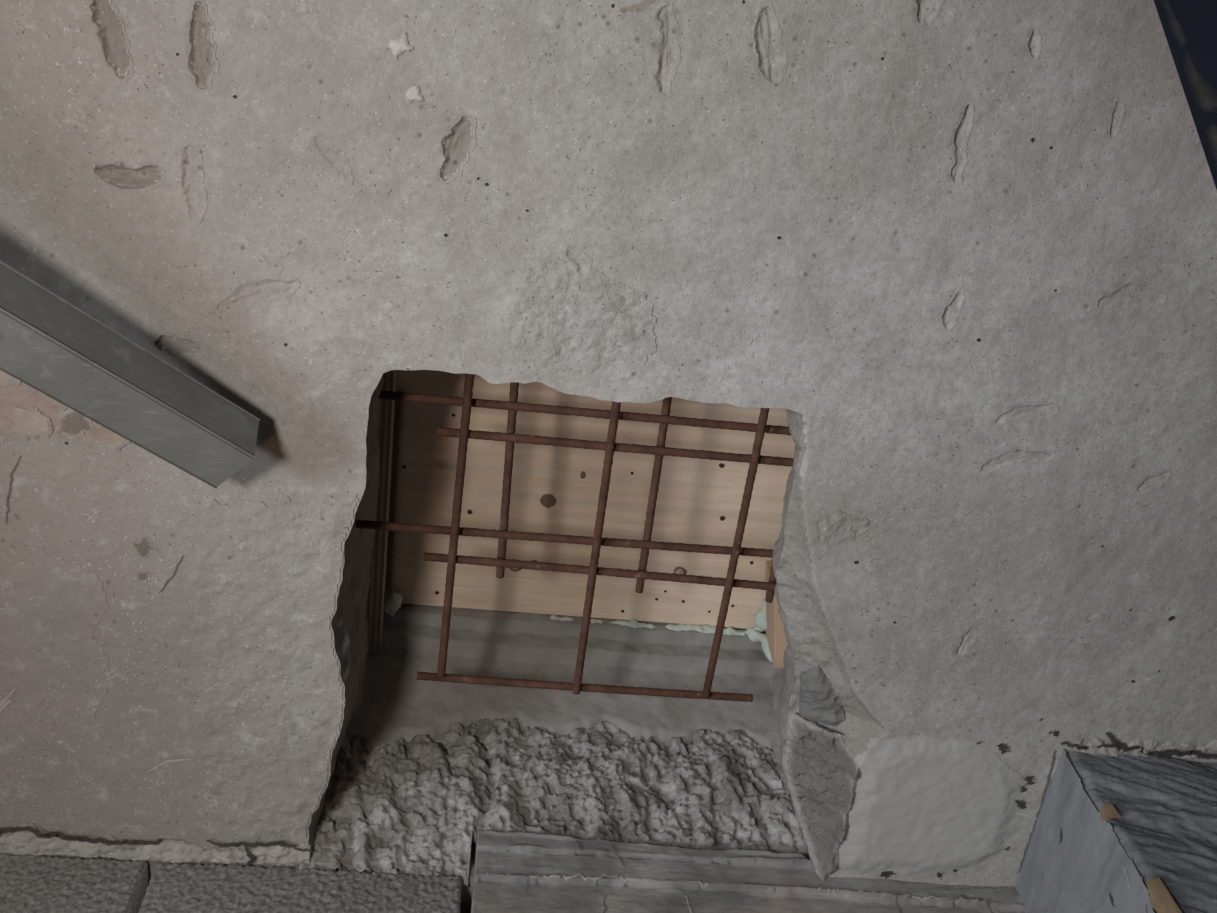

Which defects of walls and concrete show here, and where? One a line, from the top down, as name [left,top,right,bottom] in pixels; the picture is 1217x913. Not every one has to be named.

spalling [86,0,134,84]
spalling [176,0,219,92]
spalling [914,0,945,26]
spalling [437,114,477,184]
peeling [0,370,130,452]
spalling [170,373,869,888]
crack [0,827,162,846]
crack [206,840,312,866]
crack [1017,732,1217,874]